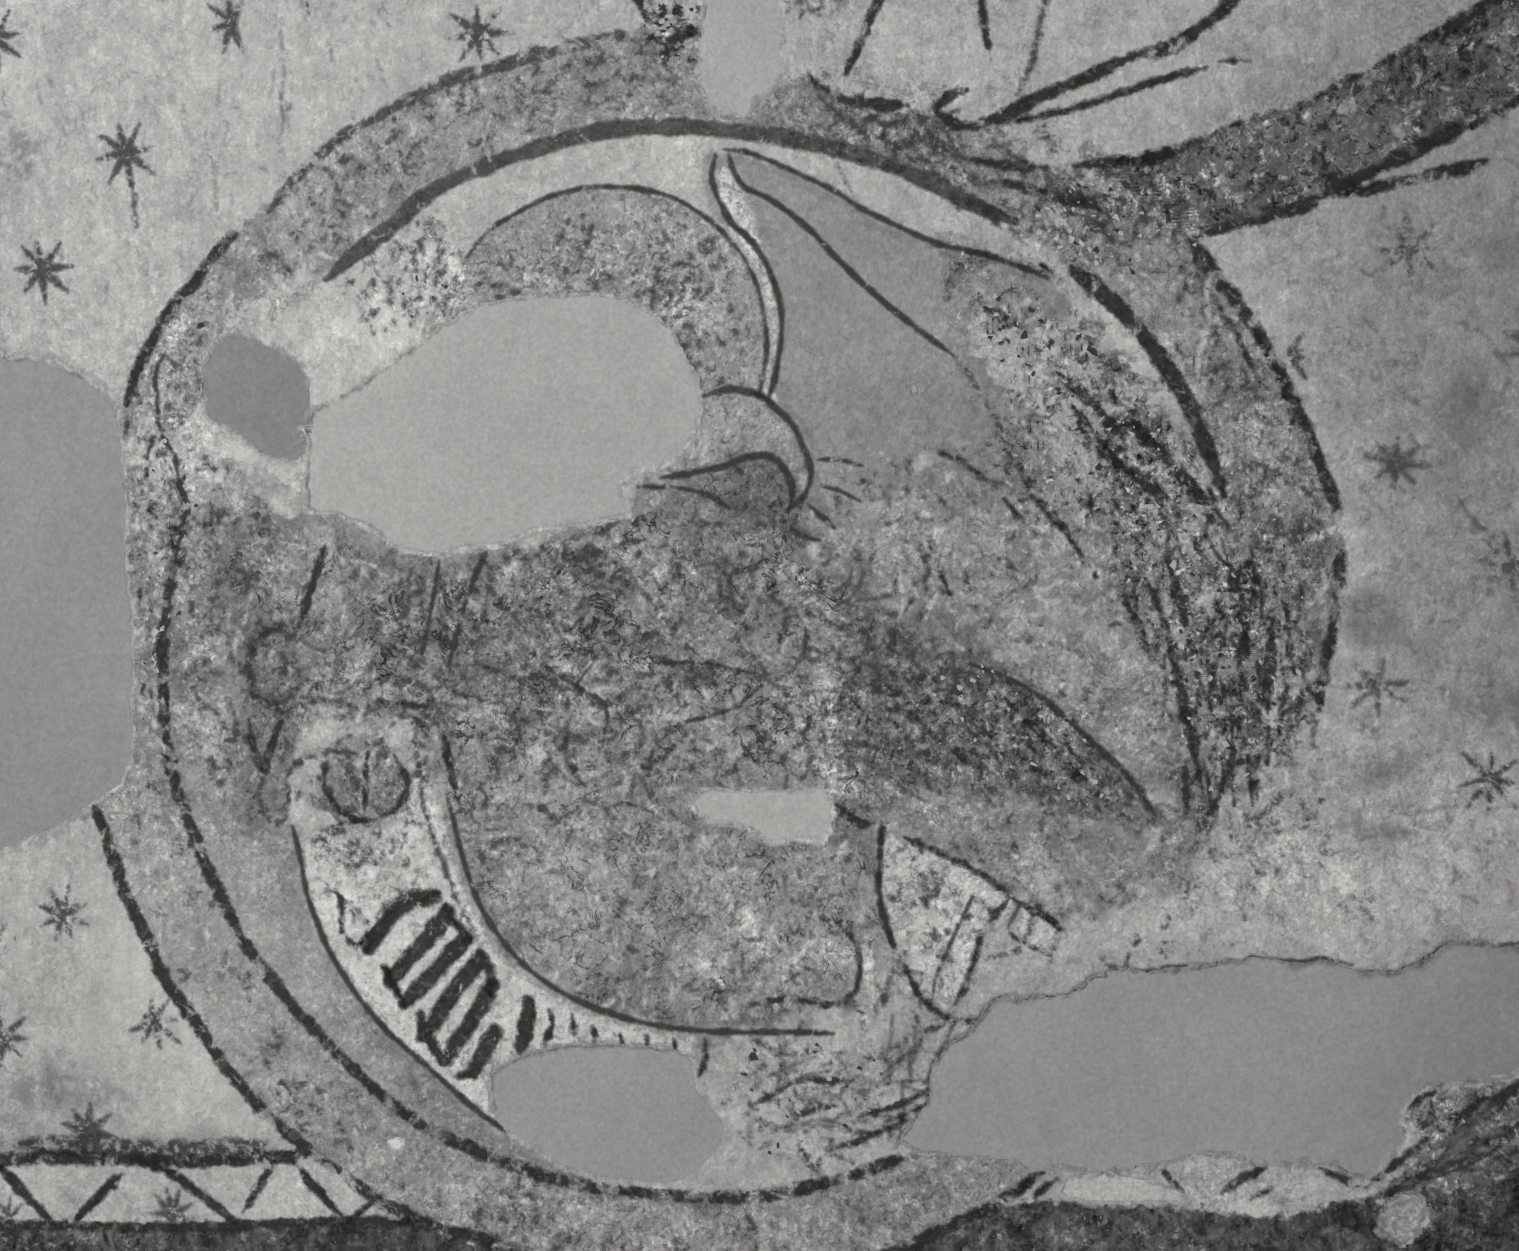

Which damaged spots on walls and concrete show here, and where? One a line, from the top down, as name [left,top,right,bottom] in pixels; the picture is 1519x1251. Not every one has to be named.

flaking render [644,0,785,115]
peeling [390,228,456,318]
peeling [133,412,199,509]
flaking render [204,295,705,562]
peeling [138,527,194,678]
flaking render [685,785,838,846]